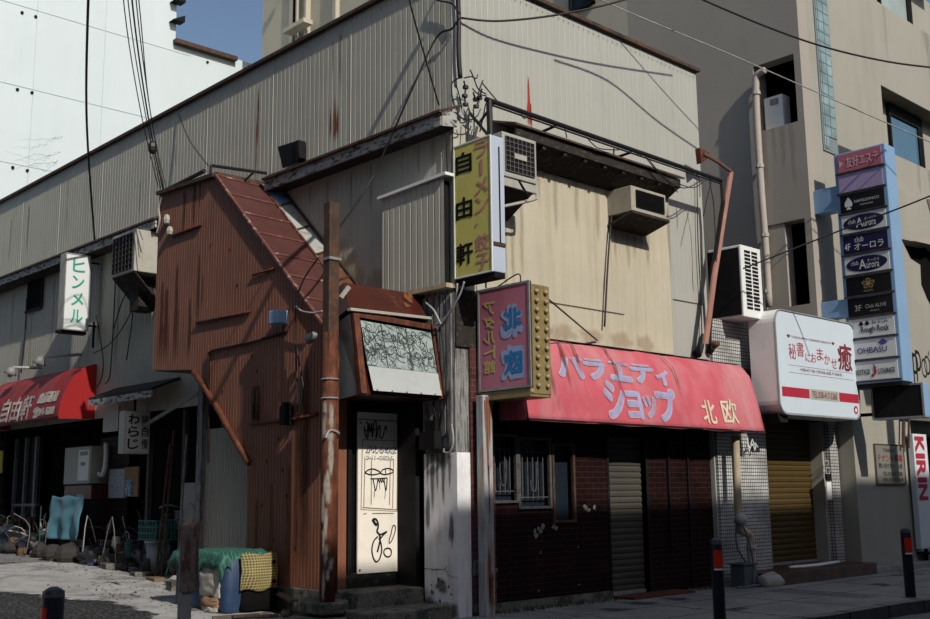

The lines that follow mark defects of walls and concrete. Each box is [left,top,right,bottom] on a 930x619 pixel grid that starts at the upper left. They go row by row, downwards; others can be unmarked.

corrosion [330,107,339,137]
corrosion [160,268,178,345]
damp [426,449,451,525]